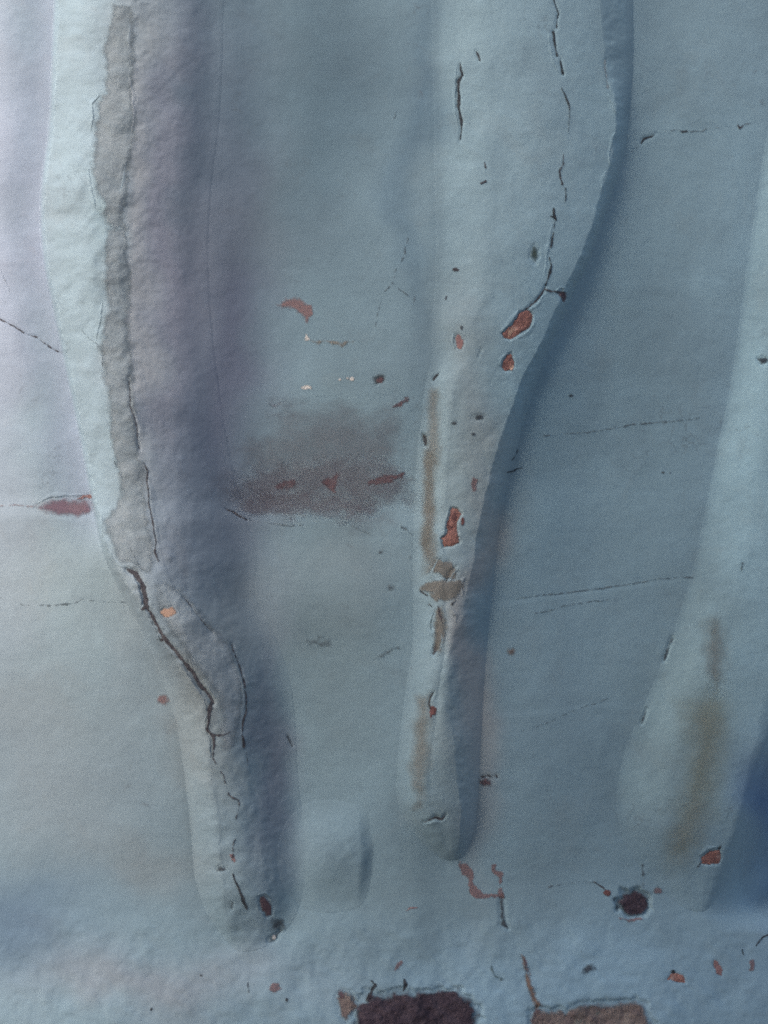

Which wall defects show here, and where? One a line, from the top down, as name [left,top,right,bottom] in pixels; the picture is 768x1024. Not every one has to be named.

crack [451,64,463,139]
crack [525,0,570,310]
spalling [282,299,312,341]
spalling [500,310,537,339]
spalling [14,492,92,515]
spalling [426,508,465,596]
crack [127,377,248,910]
spalling [698,845,721,867]
spalling [337,961,480,1024]
spalling [531,1003,647,1024]